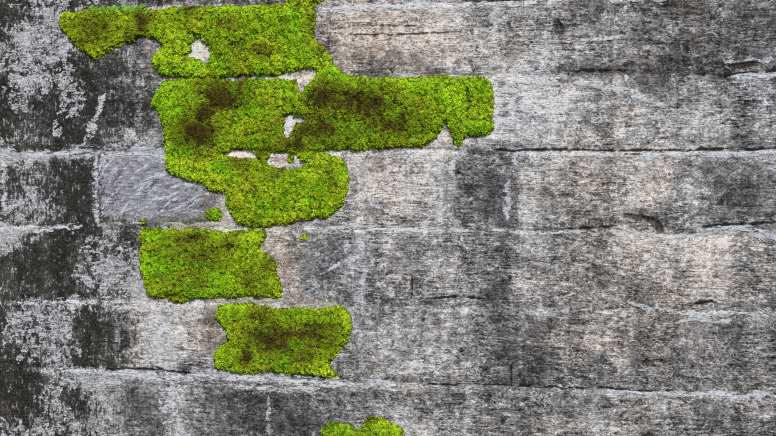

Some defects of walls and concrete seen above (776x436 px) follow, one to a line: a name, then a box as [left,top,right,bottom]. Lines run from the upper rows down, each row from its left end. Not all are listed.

leakage [17,295,416,436]